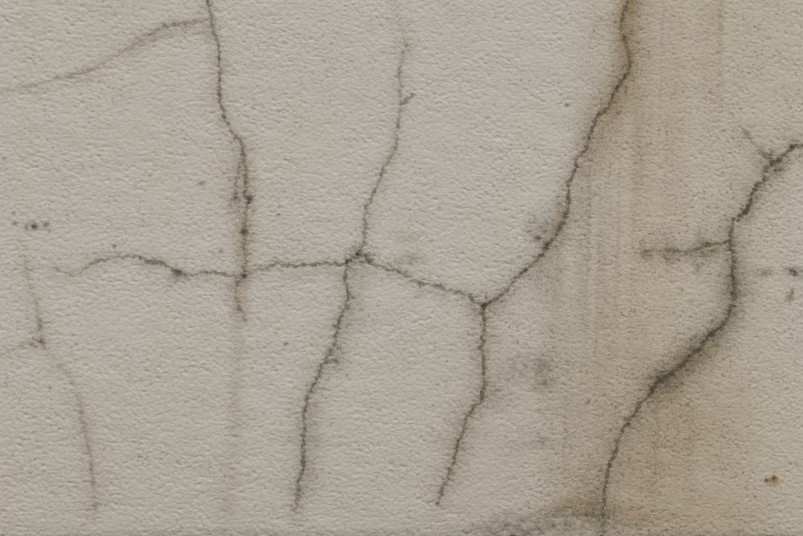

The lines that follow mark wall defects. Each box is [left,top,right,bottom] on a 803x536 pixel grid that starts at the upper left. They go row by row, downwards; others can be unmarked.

crack [436,294,503,504]
crack [603,141,803,493]